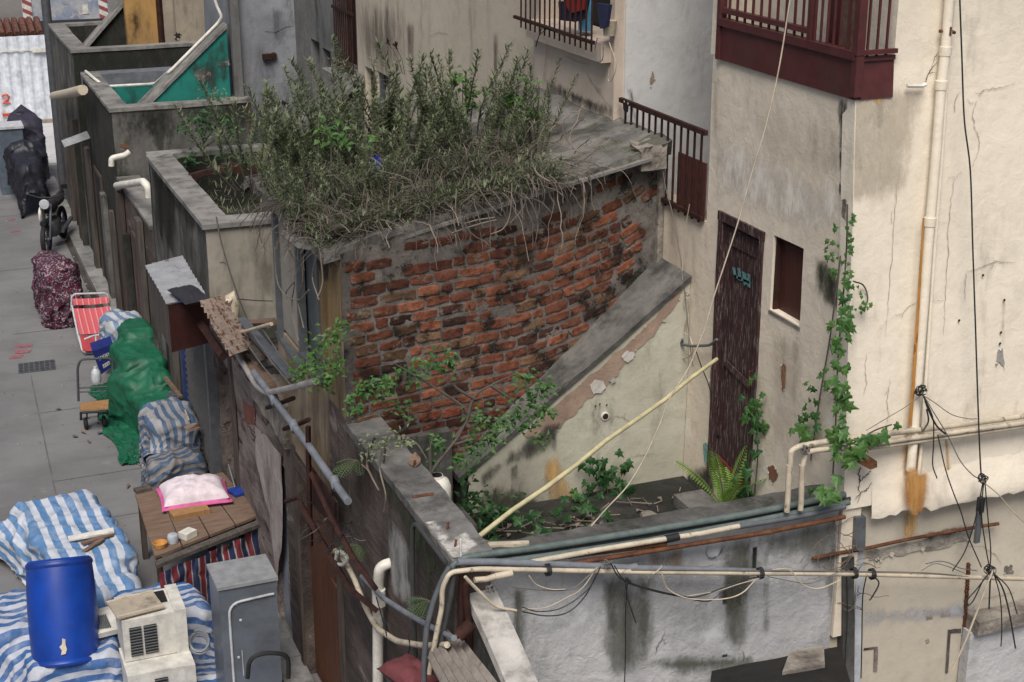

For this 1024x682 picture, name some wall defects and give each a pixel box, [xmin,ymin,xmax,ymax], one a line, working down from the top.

water stain [721,96,908,227]
crack [886,83,1014,332]
peeling [525,290,682,440]
spalling [996,331,1005,369]
crack [856,467,871,501]
water stain [608,582,647,670]
water stain [664,658,749,671]